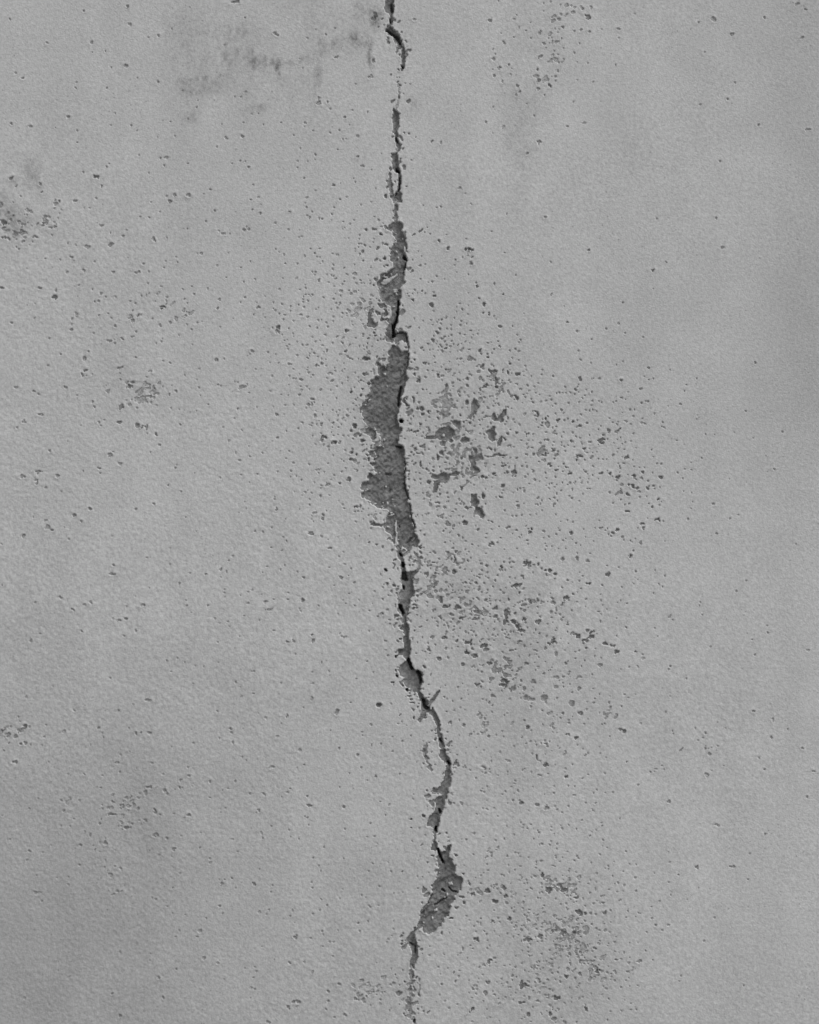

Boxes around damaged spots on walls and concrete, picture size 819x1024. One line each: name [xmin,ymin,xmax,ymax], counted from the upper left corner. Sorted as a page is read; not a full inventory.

hole [60,751,193,895]
crack [350,0,474,1024]
spalling [240,97,702,1024]
hole [491,1,602,117]